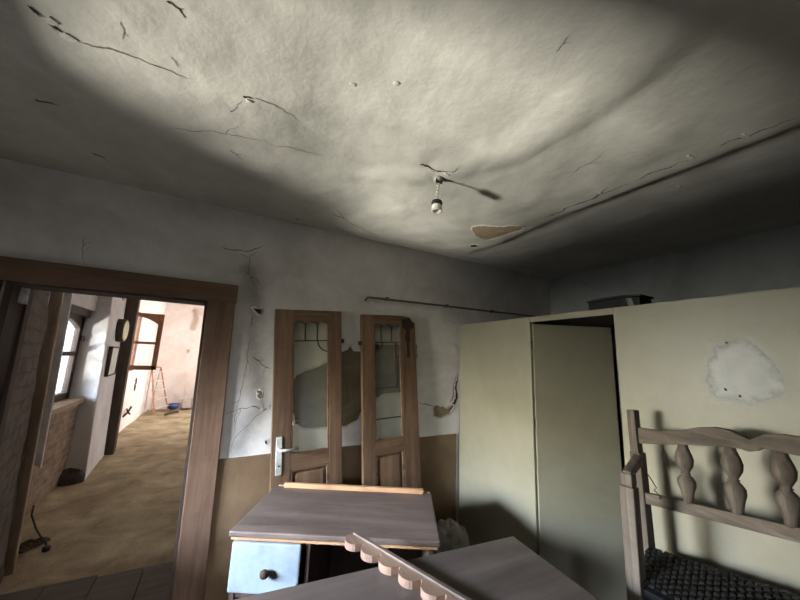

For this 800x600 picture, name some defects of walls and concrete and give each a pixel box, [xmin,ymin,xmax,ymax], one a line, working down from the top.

crack [27,5,190,79]
crack [176,96,310,159]
crack [421,164,458,176]
crack [544,155,698,218]
flaking render [469,224,526,247]
crack [226,315,271,452]
flaking render [293,359,327,431]
flaking render [342,343,361,429]
flaking render [421,373,458,419]